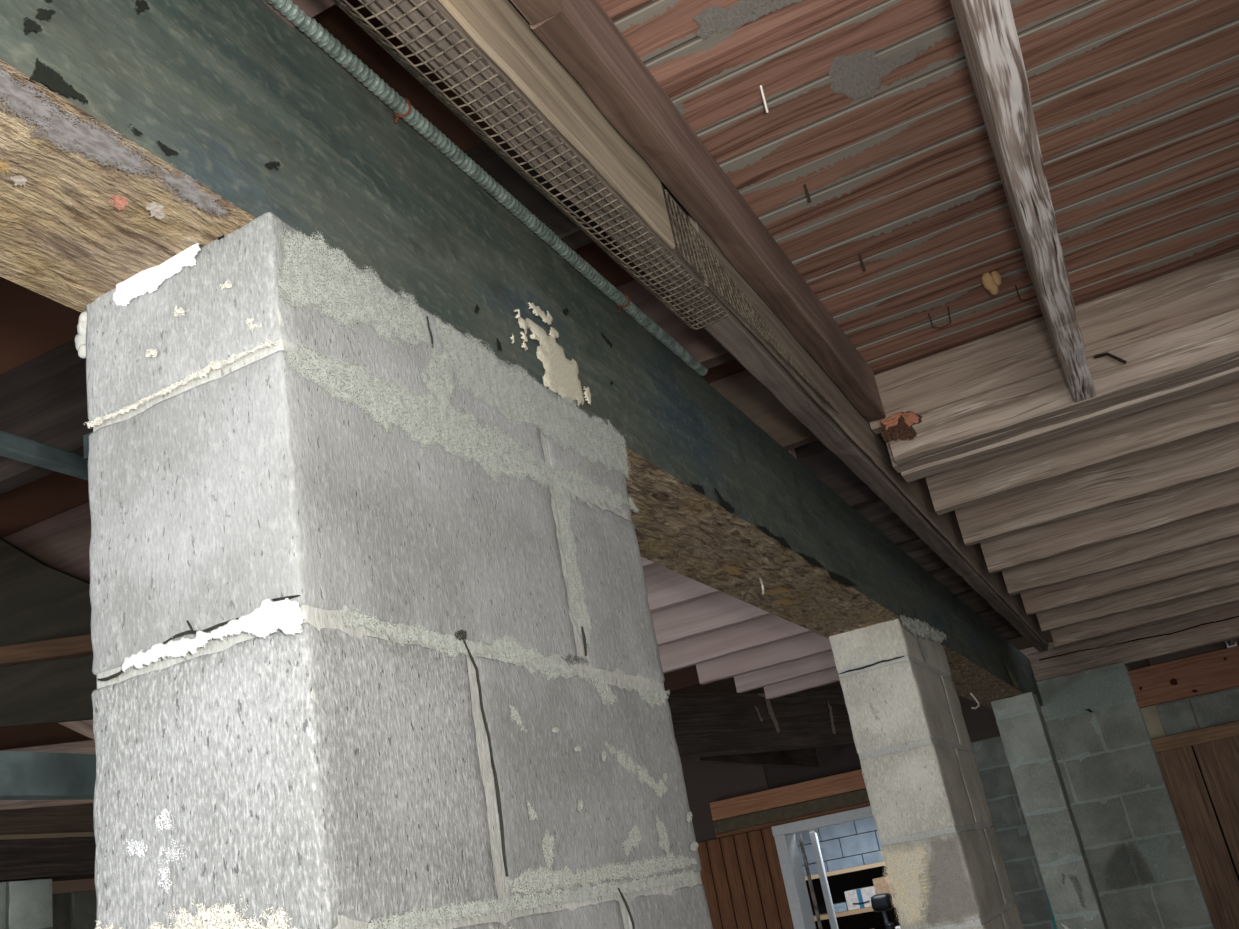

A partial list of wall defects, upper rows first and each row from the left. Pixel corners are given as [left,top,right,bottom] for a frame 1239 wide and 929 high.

spalling [24,0,56,34]
spalling [135,0,150,14]
peeling [0,58,238,220]
spalling [266,0,708,376]
crack [1039,616,1239,661]
crack [463,640,508,877]